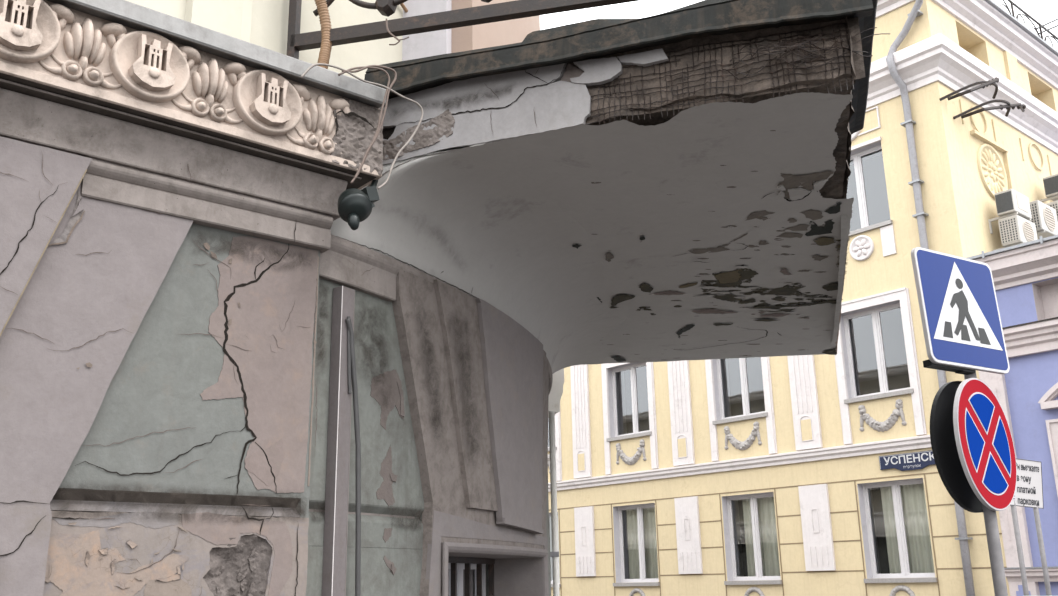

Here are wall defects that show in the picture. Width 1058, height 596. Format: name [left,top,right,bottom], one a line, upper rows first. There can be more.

crack [335,110,374,136]
spalling [330,94,455,175]
crack [401,65,565,136]
peeling [560,17,865,261]
crack [0,154,64,294]
peeling [702,290,843,315]
crack [75,226,317,534]
peeling [370,369,405,430]
peeling [376,446,397,506]
crack [0,500,114,556]
peeling [45,511,293,596]
crack [293,525,301,596]